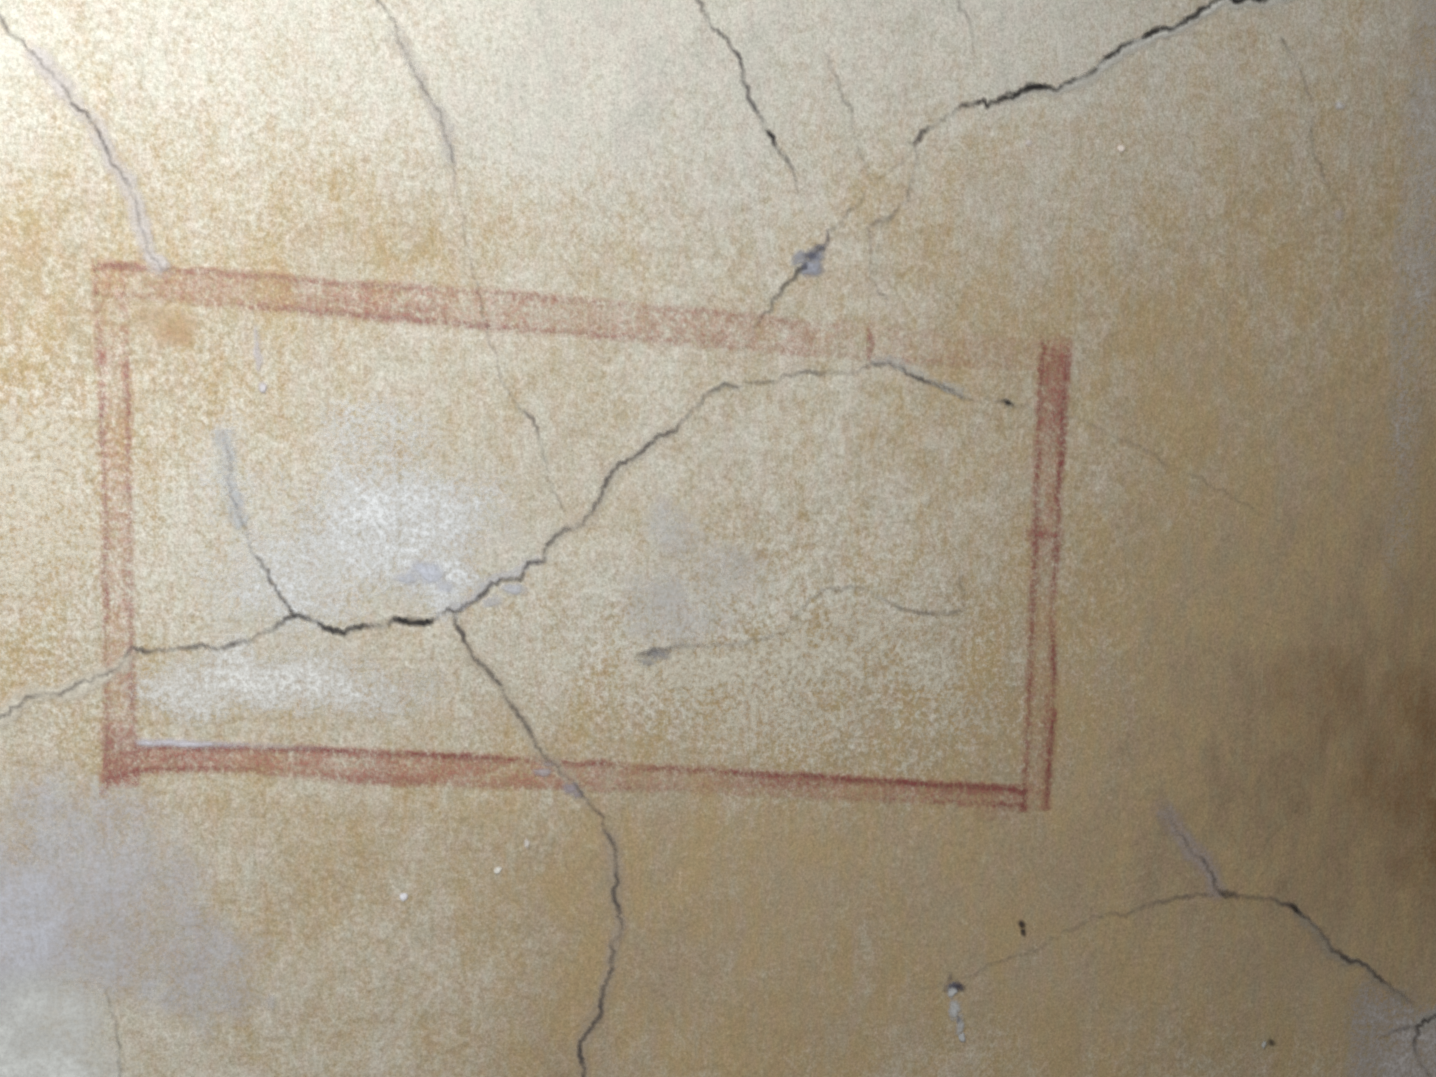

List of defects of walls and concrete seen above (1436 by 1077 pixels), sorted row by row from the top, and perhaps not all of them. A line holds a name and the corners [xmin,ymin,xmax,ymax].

crack [5,26,169,271]
crack [717,29,775,142]
crack [961,0,1286,107]
crack [593,430,675,508]
crack [0,648,149,726]
crack [268,530,562,730]
crack [577,836,625,1077]
crack [1280,903,1436,1037]